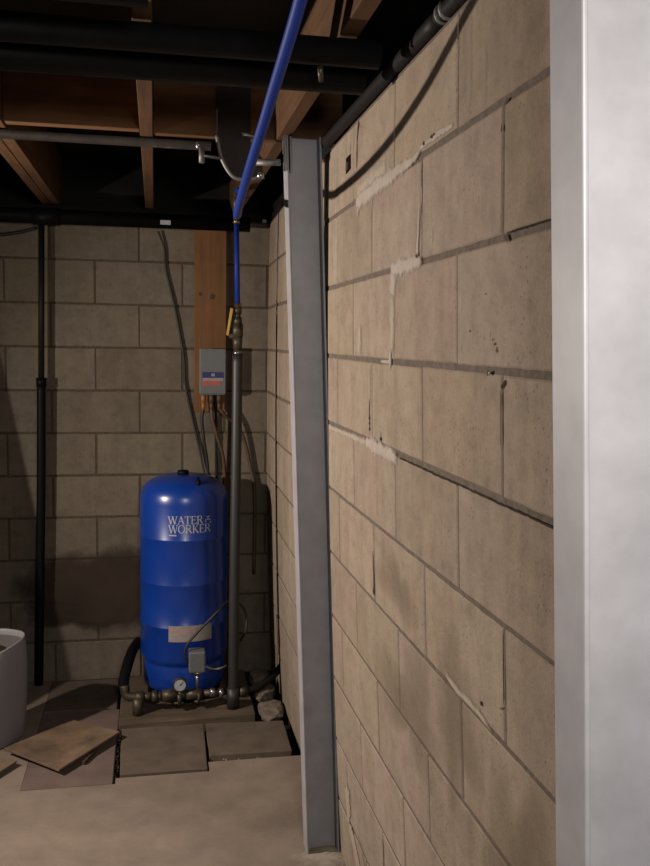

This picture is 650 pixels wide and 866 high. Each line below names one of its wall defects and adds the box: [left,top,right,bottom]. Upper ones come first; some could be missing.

crack [480,634,504,710]